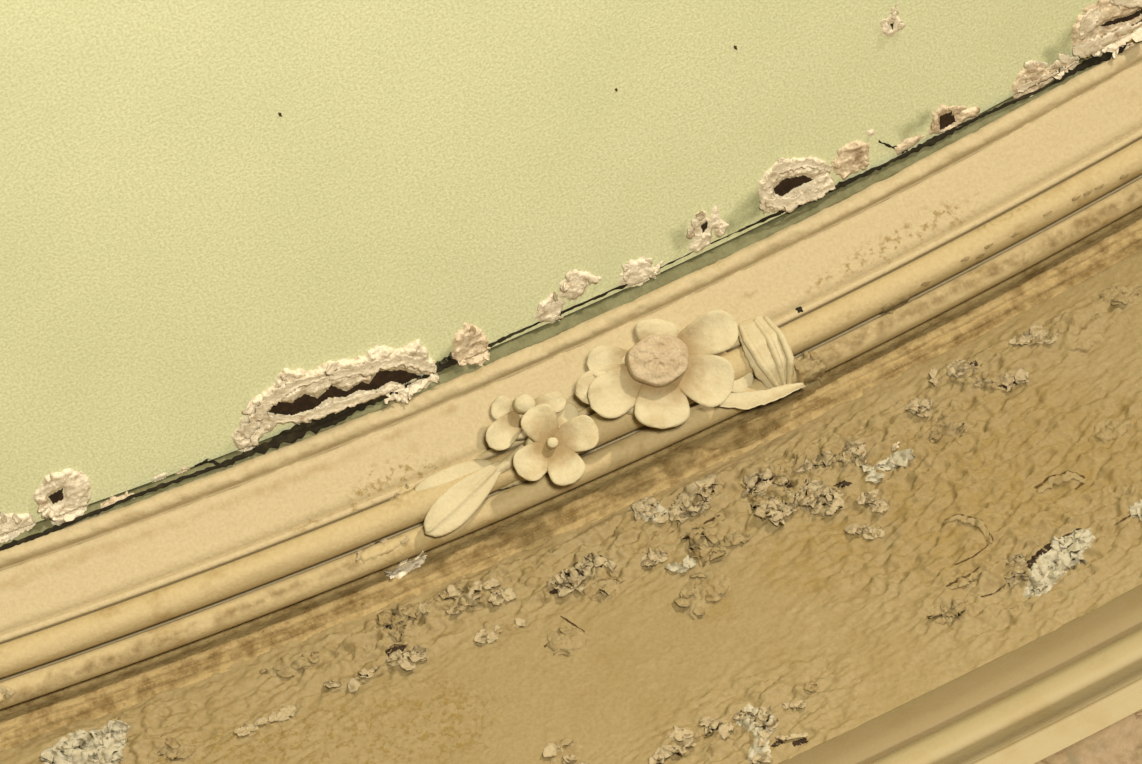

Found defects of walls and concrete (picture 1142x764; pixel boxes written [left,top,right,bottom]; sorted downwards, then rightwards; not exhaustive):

peeling [1012,0,1142,99]
peeling [757,129,875,214]
peeling [894,104,980,155]
peeling [451,323,491,367]
peeling [231,339,440,458]
peeling [0,468,134,543]
peeling [628,474,751,574]
peeling [741,440,916,540]
flaking render [1002,528,1095,599]
peeling [323,577,517,694]
peeling [40,720,131,764]
peeling [649,667,827,764]